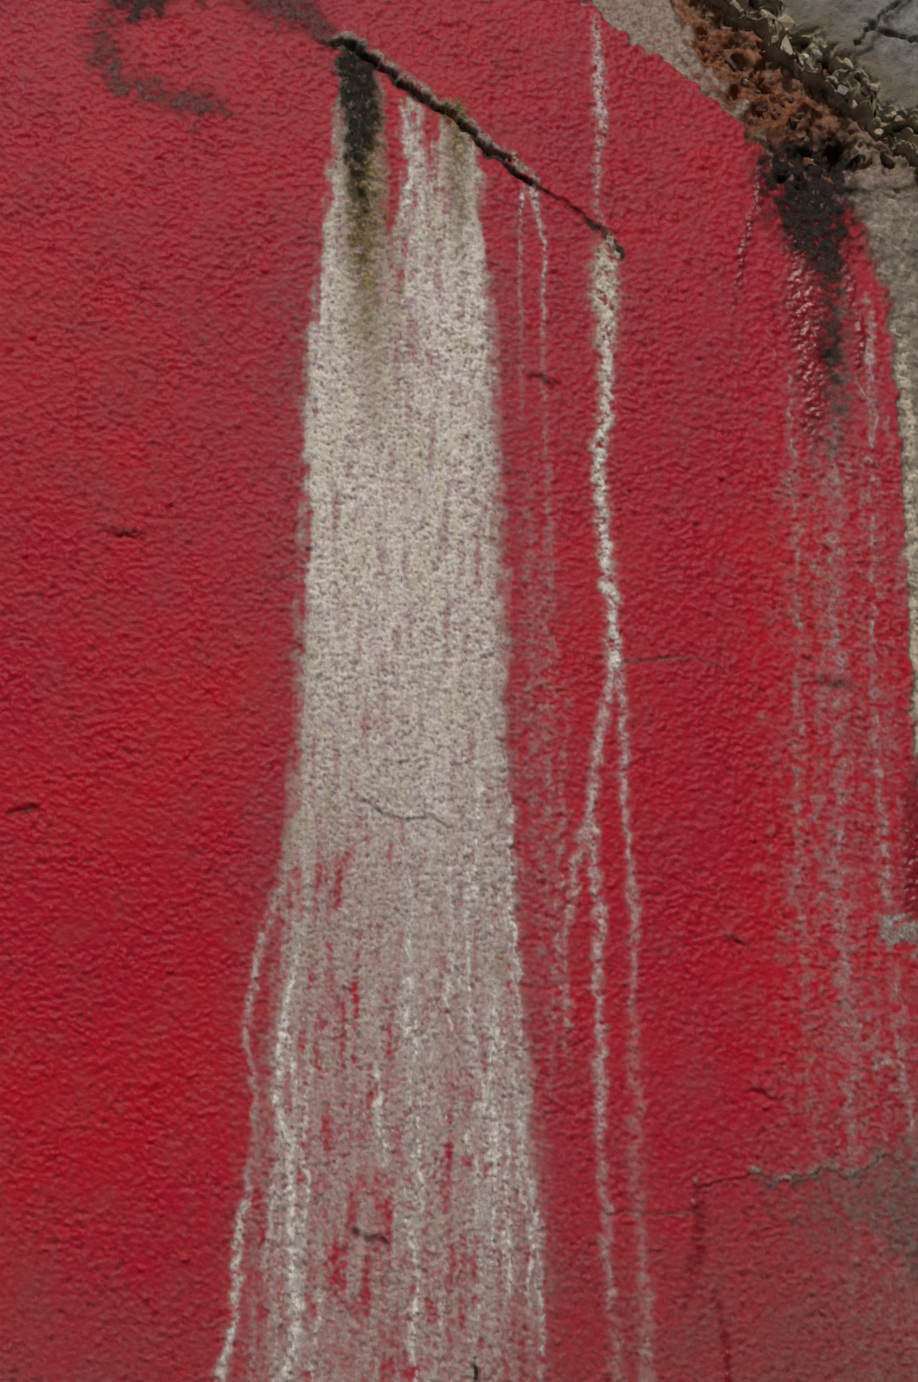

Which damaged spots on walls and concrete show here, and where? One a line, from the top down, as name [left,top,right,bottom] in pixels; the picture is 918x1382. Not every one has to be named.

crack [330,31,552,196]
corrosion [681,18,832,168]
crack [584,217,625,259]
leakage [757,126,878,460]
spalling [580,0,918,758]
leakage [216,41,547,1382]
leakage [878,799,890,901]
peeling [751,1151,885,1187]